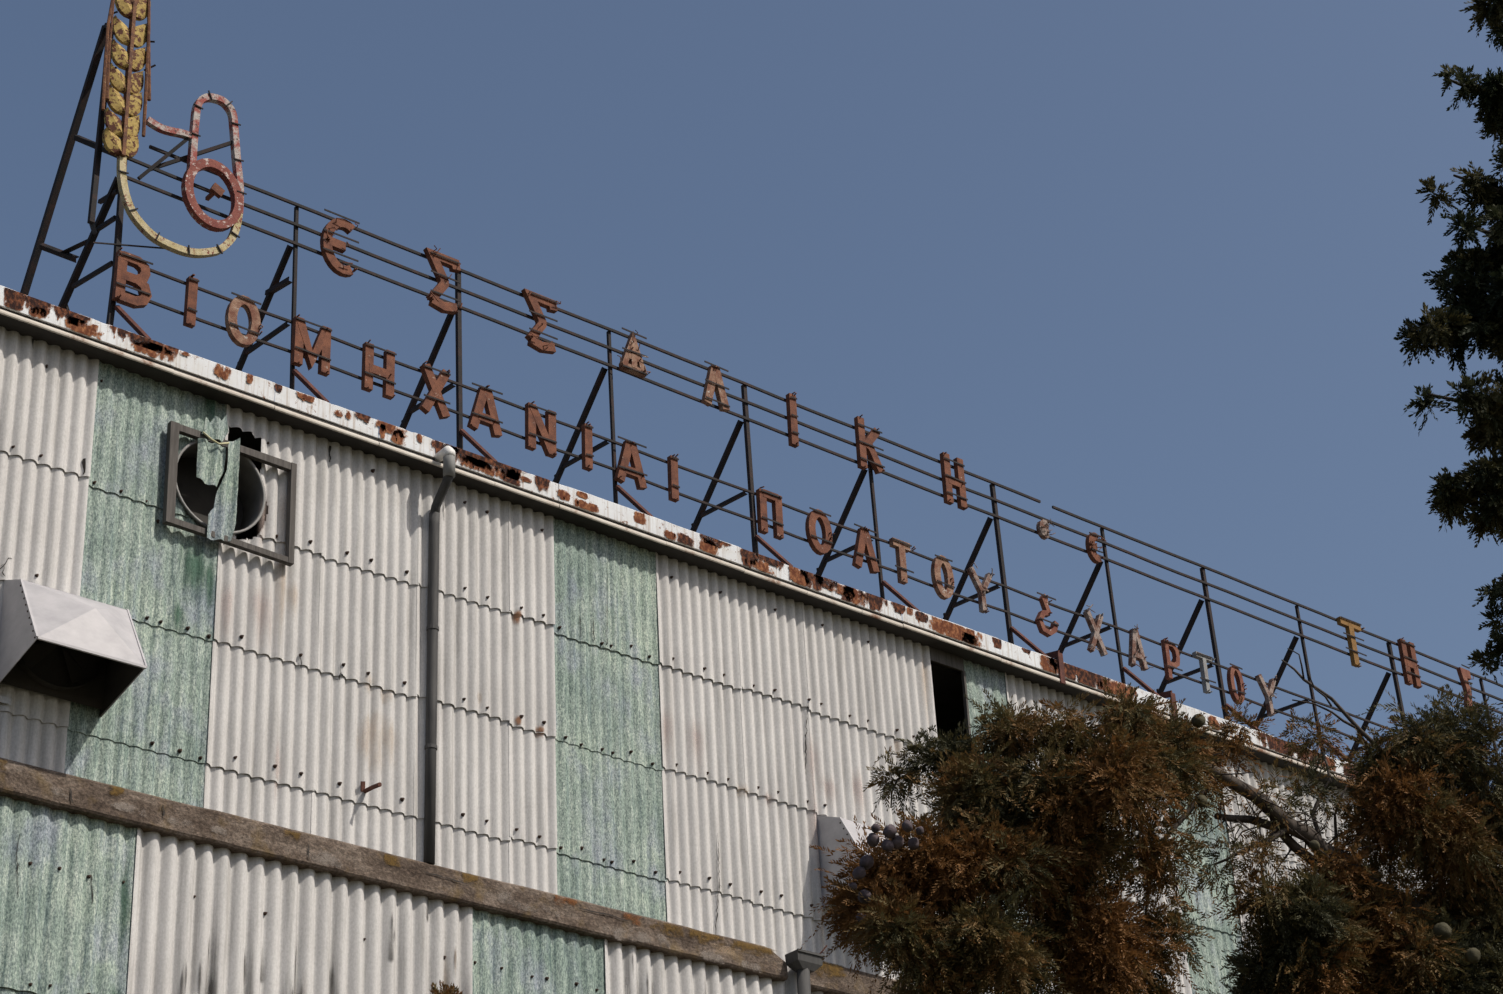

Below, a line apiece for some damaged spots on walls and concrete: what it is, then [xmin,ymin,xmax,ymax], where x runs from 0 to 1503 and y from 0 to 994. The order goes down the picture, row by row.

corrosion [4,287,189,361]
corrosion [214,363,253,384]
corrosion [275,384,315,402]
corrosion [335,410,599,513]
corrosion [634,511,646,525]
corrosion [665,530,1002,649]
corrosion [1022,648,1137,698]
corrosion [1256,731,1368,779]
leakage [181,959,215,994]